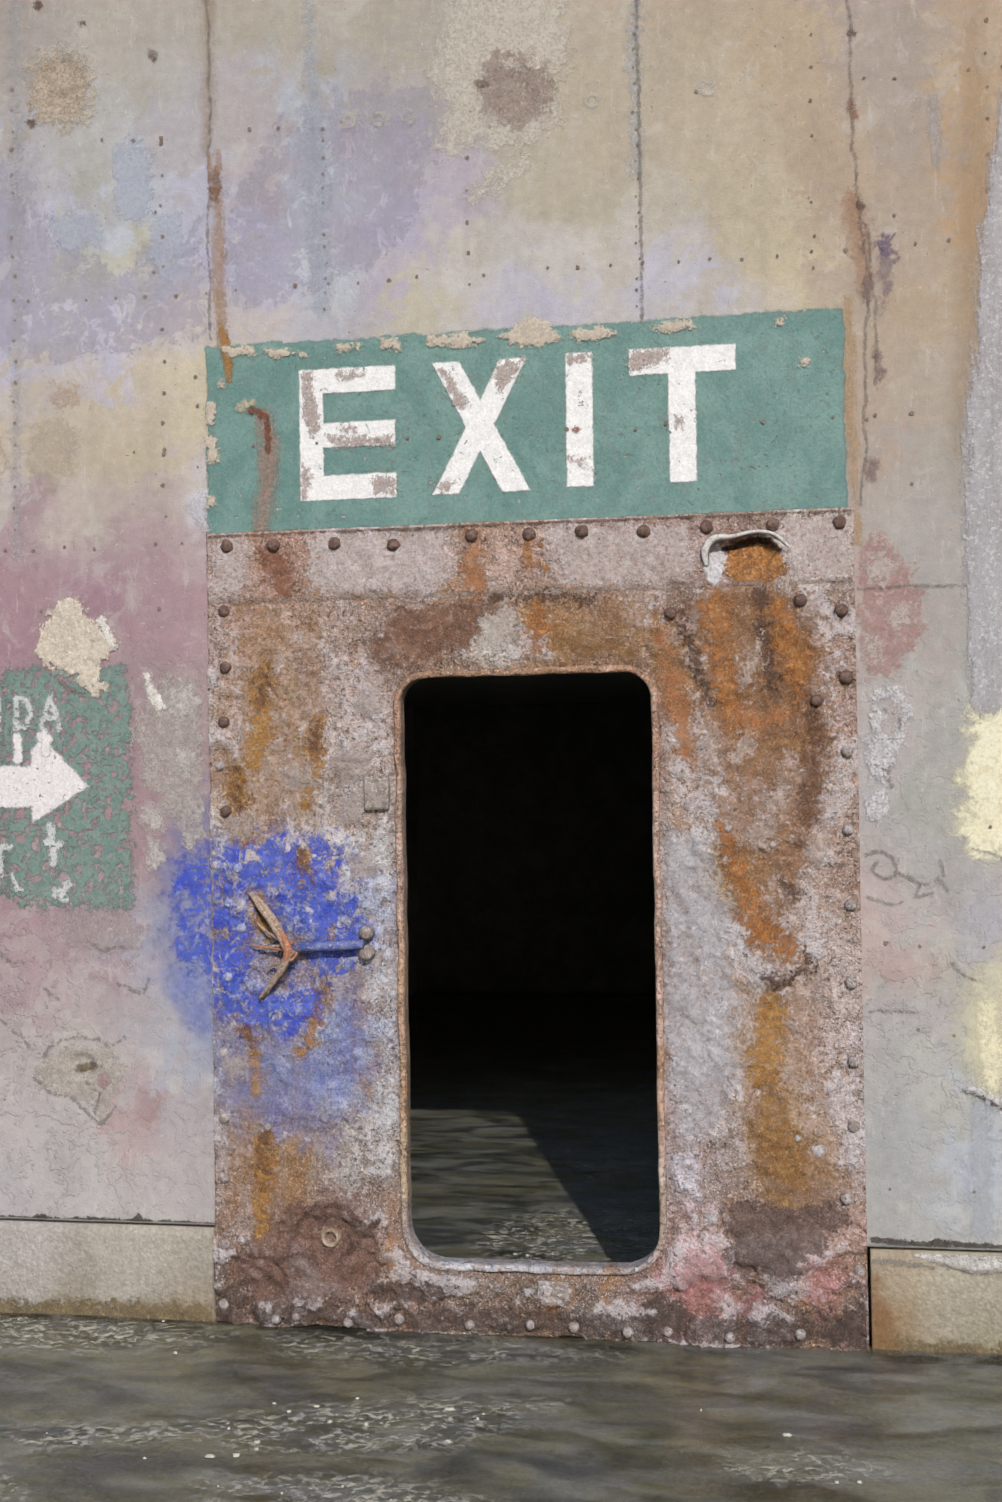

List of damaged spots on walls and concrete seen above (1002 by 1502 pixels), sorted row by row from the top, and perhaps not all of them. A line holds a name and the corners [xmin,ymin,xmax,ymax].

spalling [428,0,577,205]
corrosion [207,152,233,382]
crack [861,237,874,303]
peeling [220,342,396,451]
peeling [425,316,617,395]
crack [866,459,880,480]
crack [872,347,887,389]
leakage [960,89,1002,716]
peeling [34,596,121,698]
corrosion [370,526,639,675]
corrosion [655,581,849,1288]
corrosion [216,1125,867,1349]